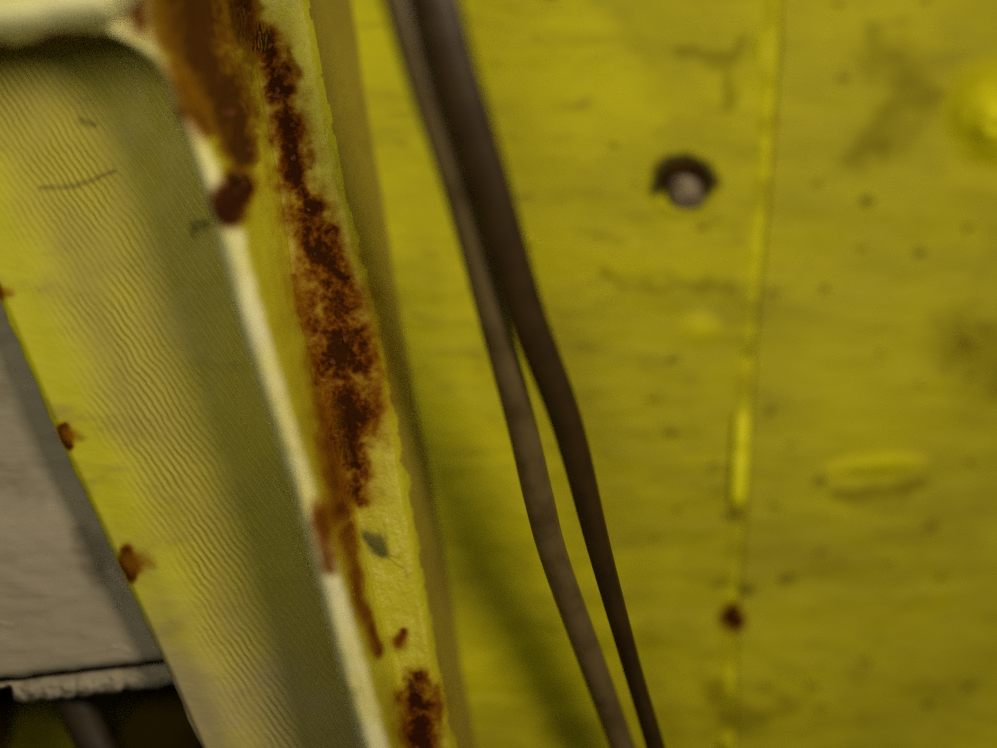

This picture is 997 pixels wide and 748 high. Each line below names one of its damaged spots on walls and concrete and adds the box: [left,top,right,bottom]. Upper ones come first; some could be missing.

rust [133,0,408,658]
rust [57,422,74,450]
rust [118,544,143,583]
rust [719,601,746,632]
rust [396,670,442,748]